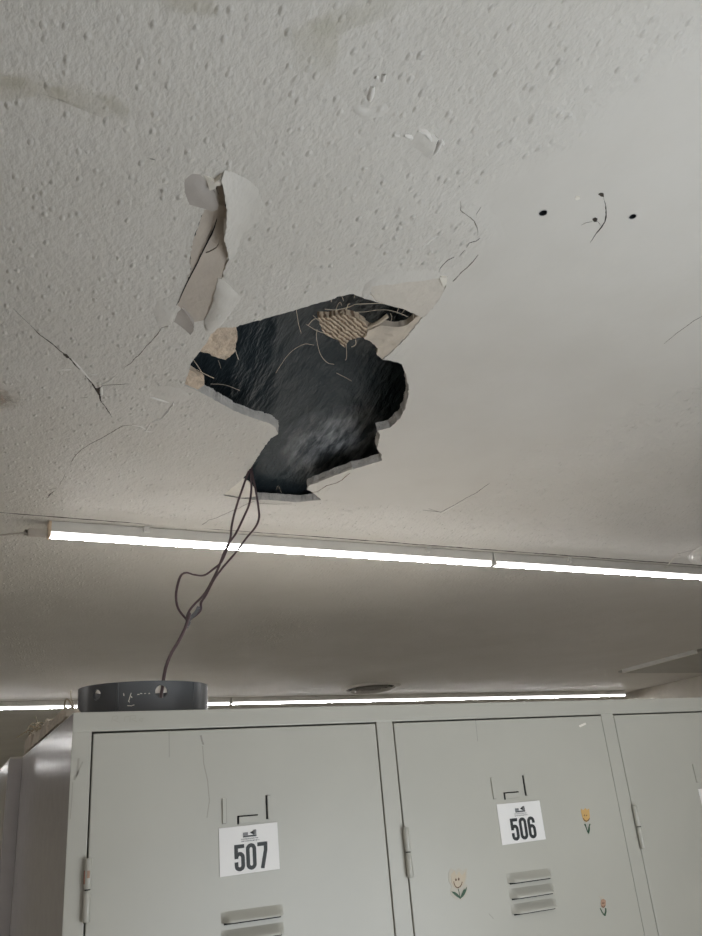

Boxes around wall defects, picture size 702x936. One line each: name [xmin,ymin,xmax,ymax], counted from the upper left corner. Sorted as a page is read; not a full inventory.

peeling [153,170,262,335]
crack [439,186,481,281]
crack [0,315,175,525]
spalling [185,385,279,432]
spalling [224,366,409,502]
crack [202,495,702,566]